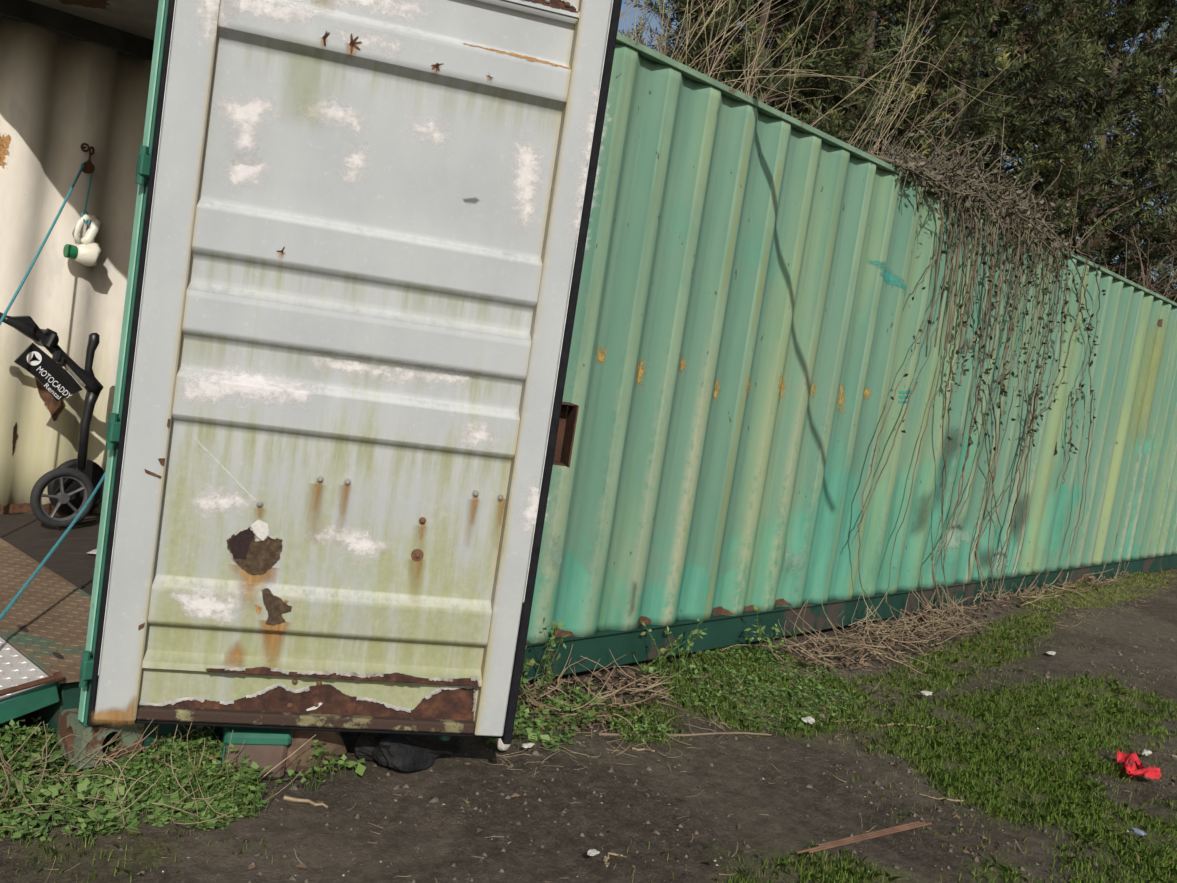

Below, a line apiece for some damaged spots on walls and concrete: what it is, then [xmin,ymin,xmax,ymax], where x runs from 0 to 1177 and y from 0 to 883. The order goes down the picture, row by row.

peeling [523,0,578,13]
corrosion [349,33,362,55]
peeling [306,100,363,132]
corrosion [0,134,11,169]
peeling [220,97,274,185]
peeling [342,150,366,182]
corrosion [313,483,321,519]
corrosion [238,566,292,656]
corrosion [712,605,758,616]